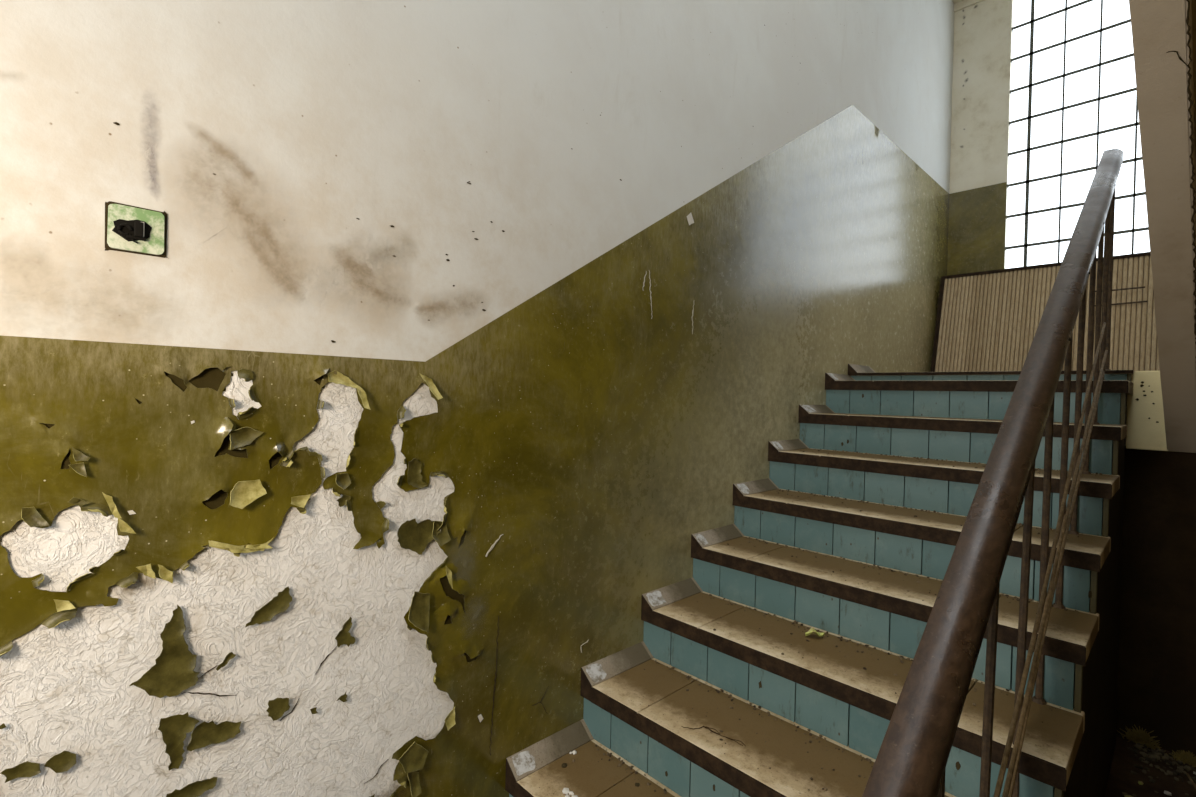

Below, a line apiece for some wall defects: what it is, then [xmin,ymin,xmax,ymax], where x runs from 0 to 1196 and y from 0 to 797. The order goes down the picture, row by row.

crack [1166,0,1196,358]
peeling [0,369,456,797]